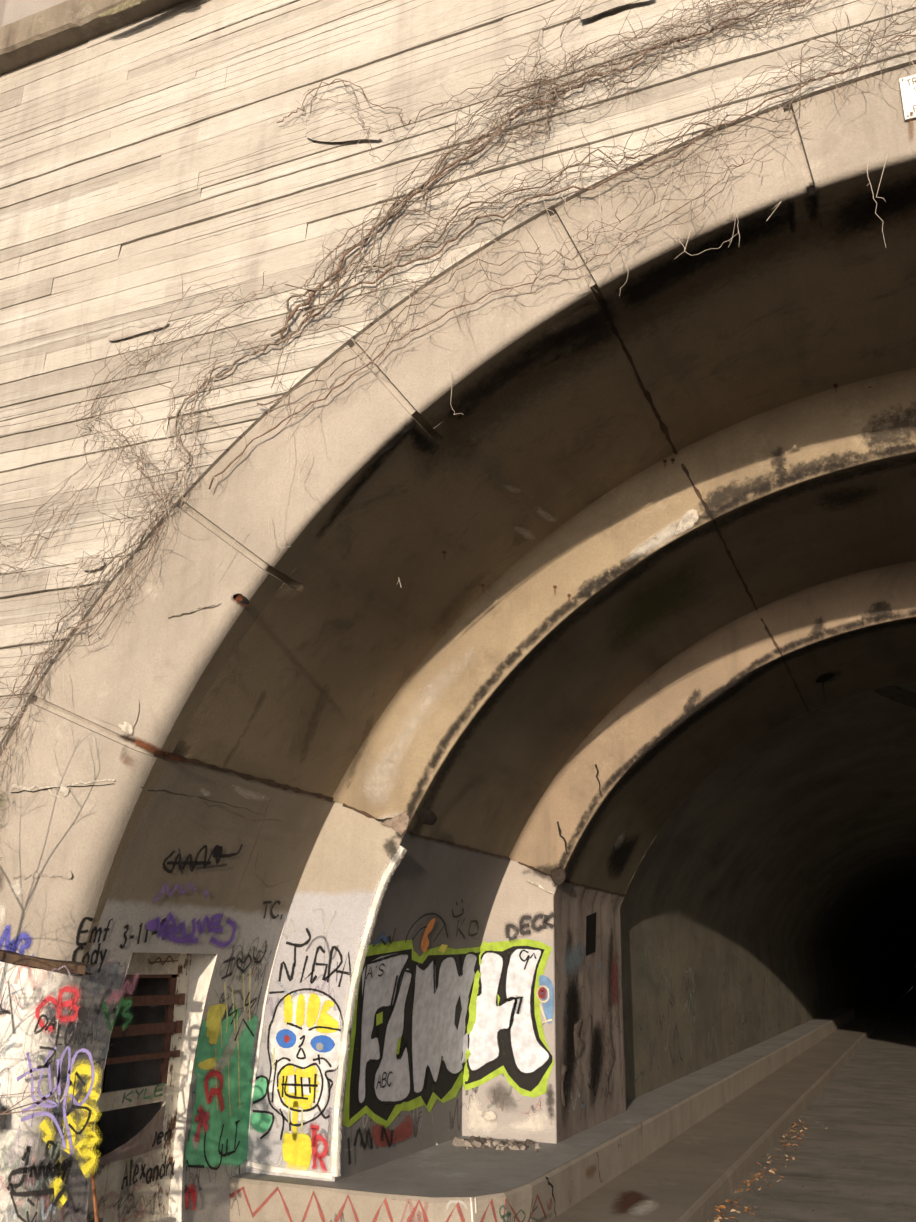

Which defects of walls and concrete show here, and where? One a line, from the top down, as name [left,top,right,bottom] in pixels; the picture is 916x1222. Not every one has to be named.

damp [449,183,818,418]
damp [318,420,435,535]
damp [396,403,916,839]
corrosion [119,734,187,763]